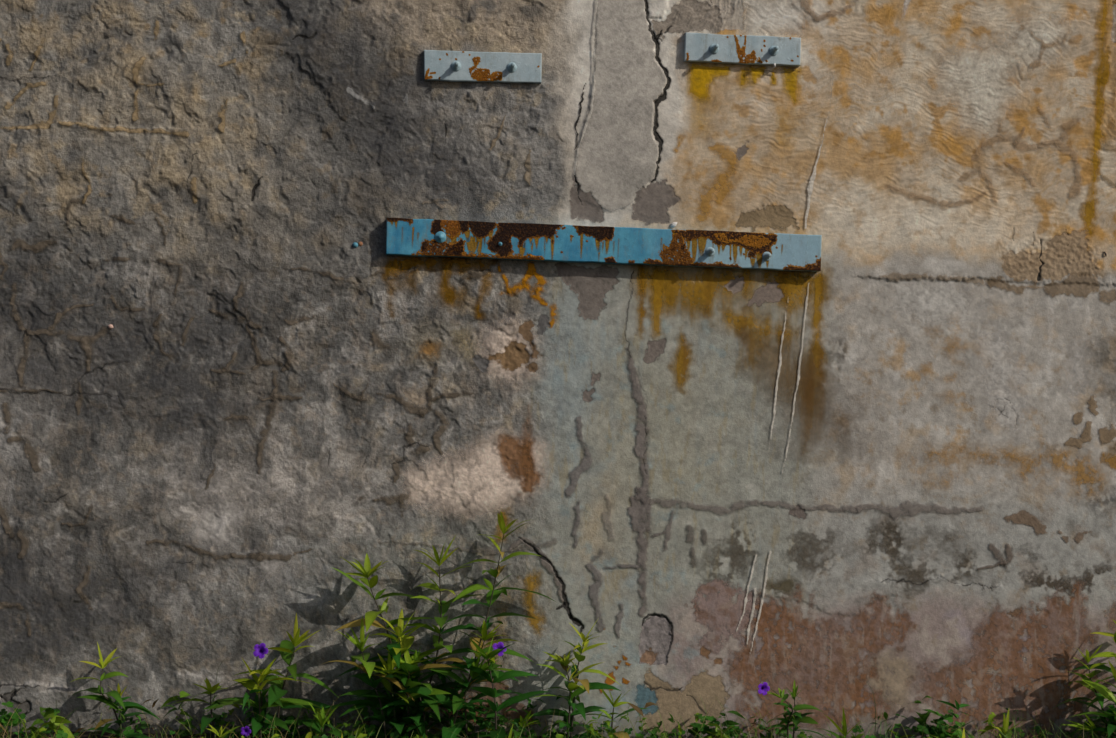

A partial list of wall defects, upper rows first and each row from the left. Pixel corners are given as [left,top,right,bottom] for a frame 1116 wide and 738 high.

rust [424,51,502,81]
crack [574,83,586,202]
crack [644,0,672,183]
rust [686,35,799,101]
rust [385,144,825,376]
crack [333,366,473,516]
crack [403,269,982,640]
leakage [771,313,786,437]
leakage [782,284,809,473]
leakage [717,531,794,651]
peeling [635,579,916,737]
leakage [1025,567,1110,596]